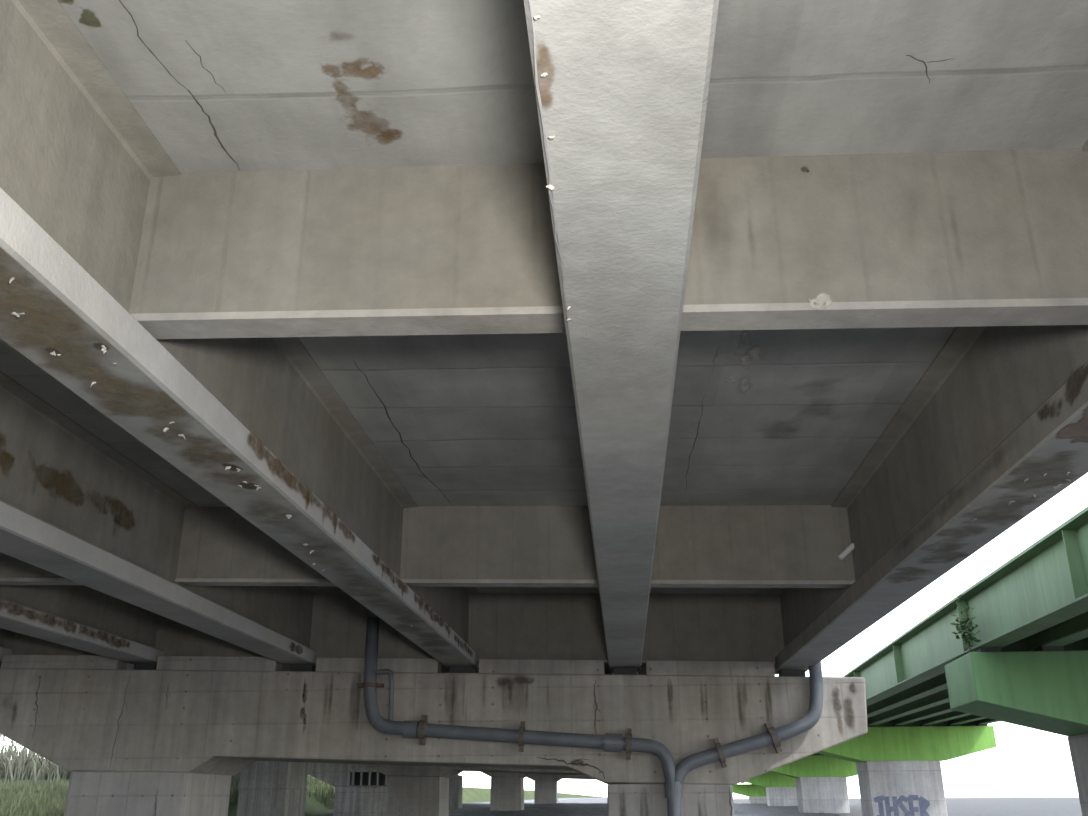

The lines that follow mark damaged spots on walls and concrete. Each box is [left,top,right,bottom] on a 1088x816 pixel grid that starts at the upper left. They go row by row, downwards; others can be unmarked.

crack [119,0,239,169]
rust [324,61,381,93]
rust [537,48,548,69]
rust [350,104,400,143]
peeling [0,248,261,491]
peeling [1038,366,1088,420]
crack [354,361,452,505]
peeling [1057,406,1088,443]
rust [0,600,130,647]
crack [593,680,601,730]
water stain [833,683,855,728]
crack [537,757,605,780]